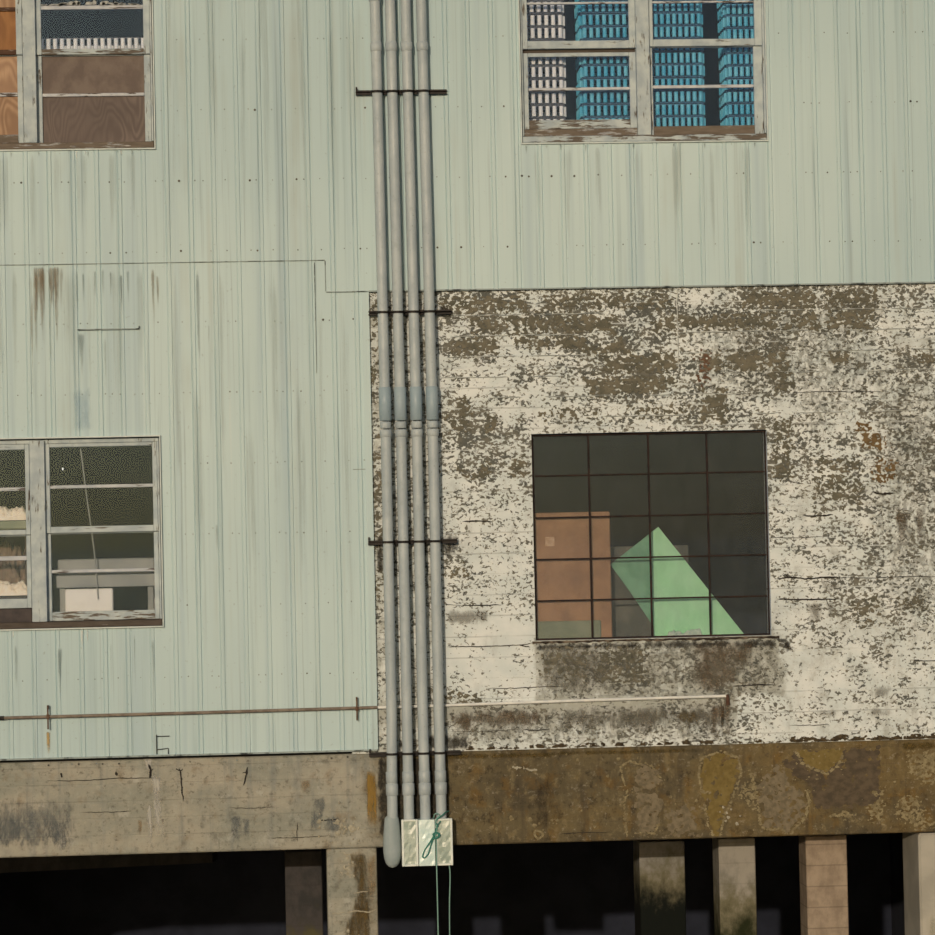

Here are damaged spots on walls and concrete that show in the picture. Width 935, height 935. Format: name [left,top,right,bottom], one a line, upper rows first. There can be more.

peeling [437,286,881,428]
peeling [444,395,502,436]
peeling [507,453,531,478]
peeling [767,414,797,482]
peeling [810,454,868,511]
peeling [849,594,882,629]
peeling [896,590,929,615]
damp [538,639,790,689]
peeling [444,690,483,707]
damp [906,748,935,786]
damp [698,747,845,837]
damp [828,786,935,831]